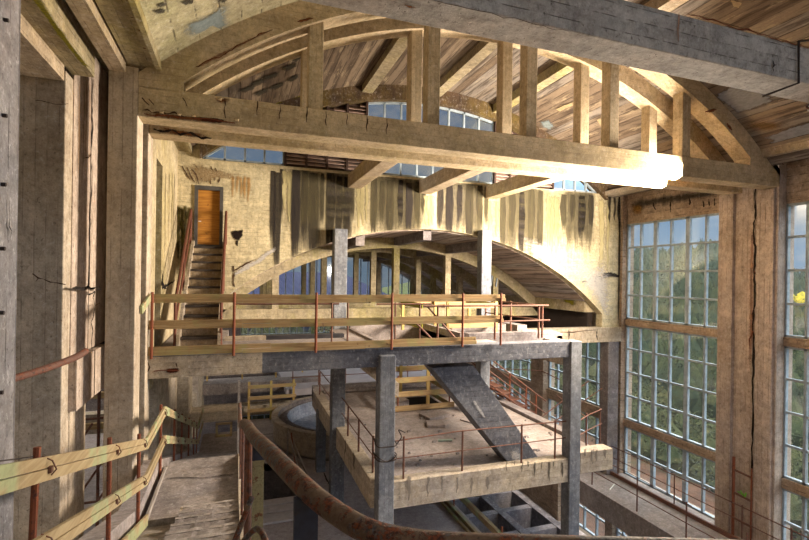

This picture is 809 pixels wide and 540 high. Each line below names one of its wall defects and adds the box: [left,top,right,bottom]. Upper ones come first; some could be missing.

crack [85,80,94,169]
spalling [153,128,211,140]
spalling [144,109,239,123]
leakage [270,169,641,320]
crack [33,248,101,348]
crack [749,189,757,469]